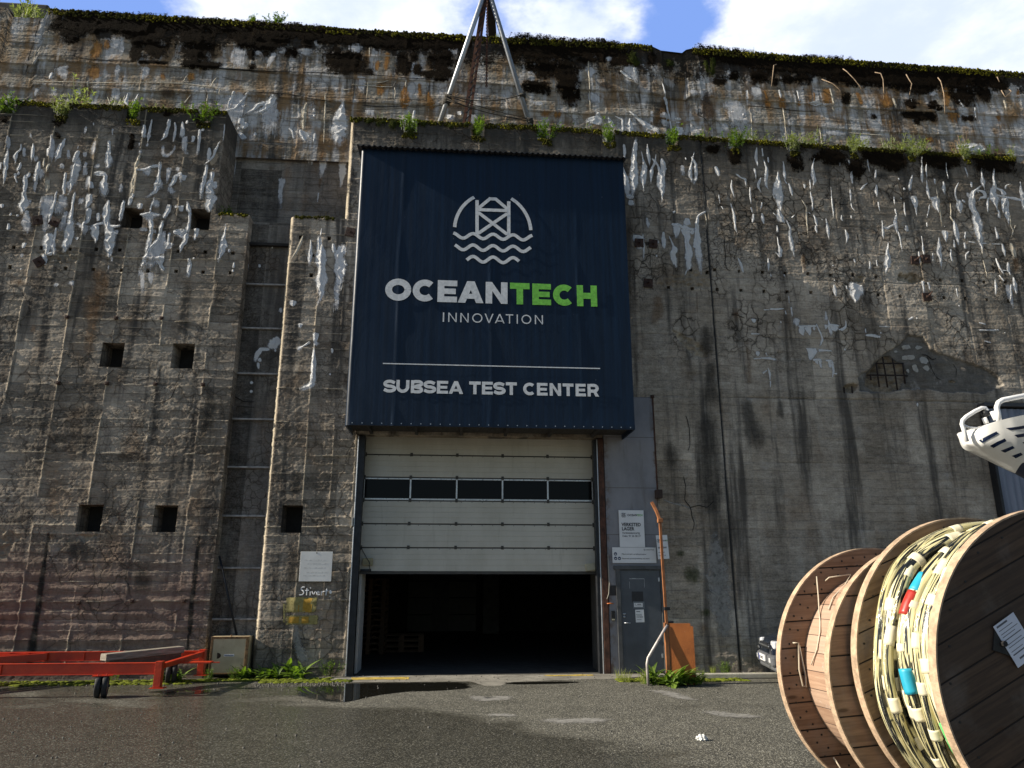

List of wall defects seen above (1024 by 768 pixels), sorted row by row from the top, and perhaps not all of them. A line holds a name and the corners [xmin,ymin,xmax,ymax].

leakage [230,40,319,68]
leakage [289,76,396,144]
corrosion [764,88,834,110]
corrosion [928,87,976,122]
leakage [0,65,279,291]
leakage [291,229,347,309]
leakage [633,211,707,275]
leakage [681,148,1024,306]
leakage [298,333,319,390]
leakage [751,296,847,378]
spalling [843,335,1003,394]
crack [683,476,714,532]